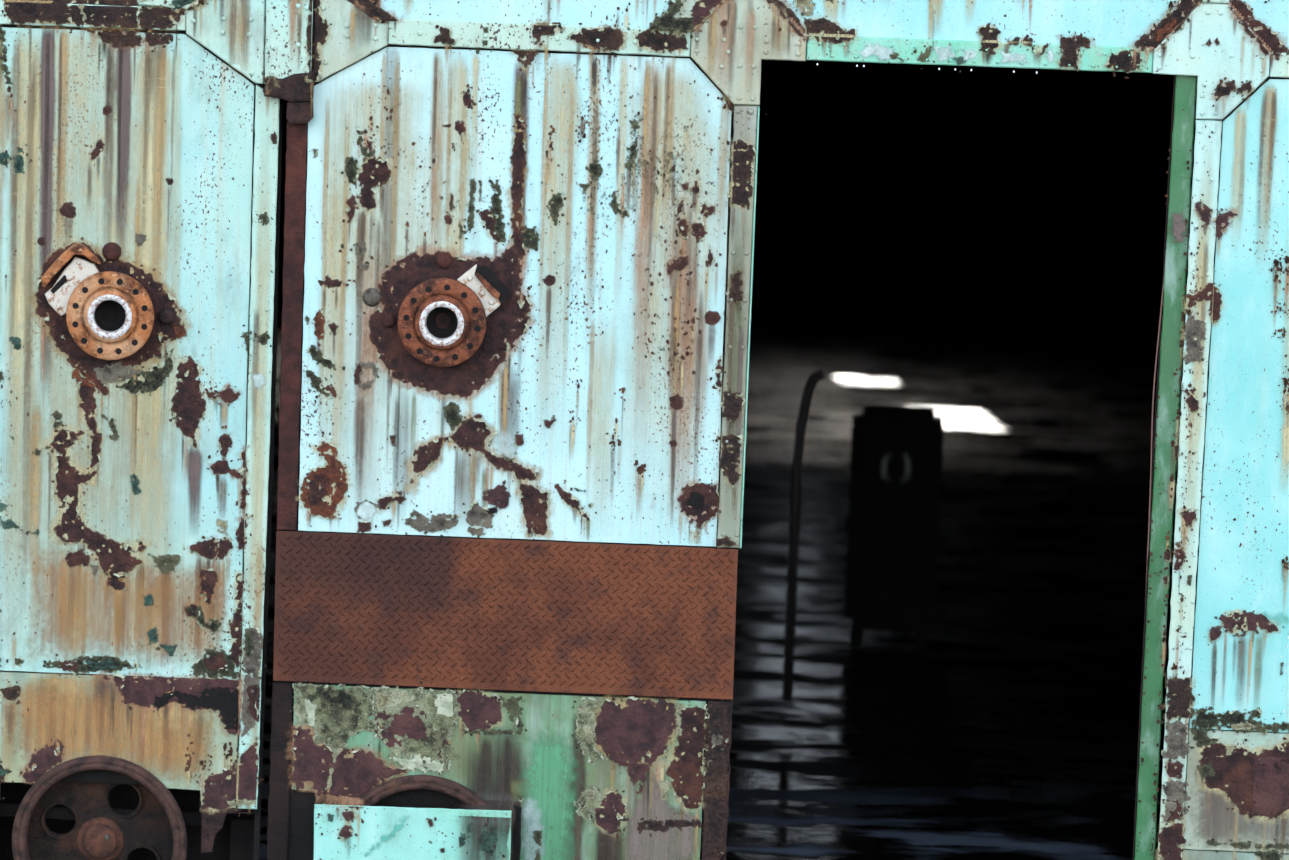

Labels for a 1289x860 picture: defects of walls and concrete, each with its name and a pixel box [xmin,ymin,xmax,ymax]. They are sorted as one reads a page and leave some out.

corrosion [291,0,332,95]
corrosion [976,14,1095,71]
corrosion [1098,0,1223,79]
corrosion [1228,0,1288,68]
corrosion [298,0,759,550]
corrosion [1180,77,1276,420]
corrosion [0,0,264,816]
corrosion [1160,509,1198,598]
peeling [290,680,461,775]
corrosion [569,693,731,860]
corrosion [1158,609,1289,856]
corrosion [1150,799,1191,860]